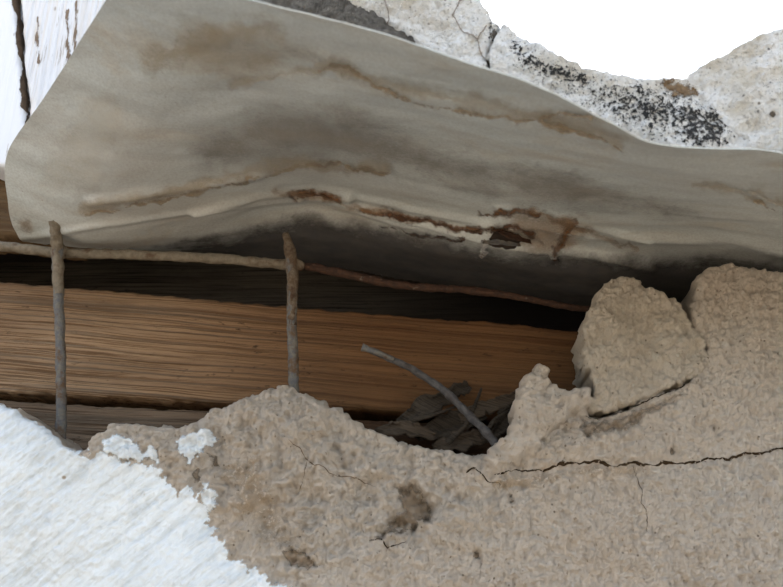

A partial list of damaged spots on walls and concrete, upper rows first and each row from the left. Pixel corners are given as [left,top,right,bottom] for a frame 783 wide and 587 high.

crack [452,0,487,58]
leakage [445,108,619,150]
rust [49,220,65,294]
rust [282,232,299,325]
rust [553,219,578,261]
crack [586,382,689,419]
peeling [0,403,291,587]
crack [466,447,783,531]
spalling [283,550,314,570]